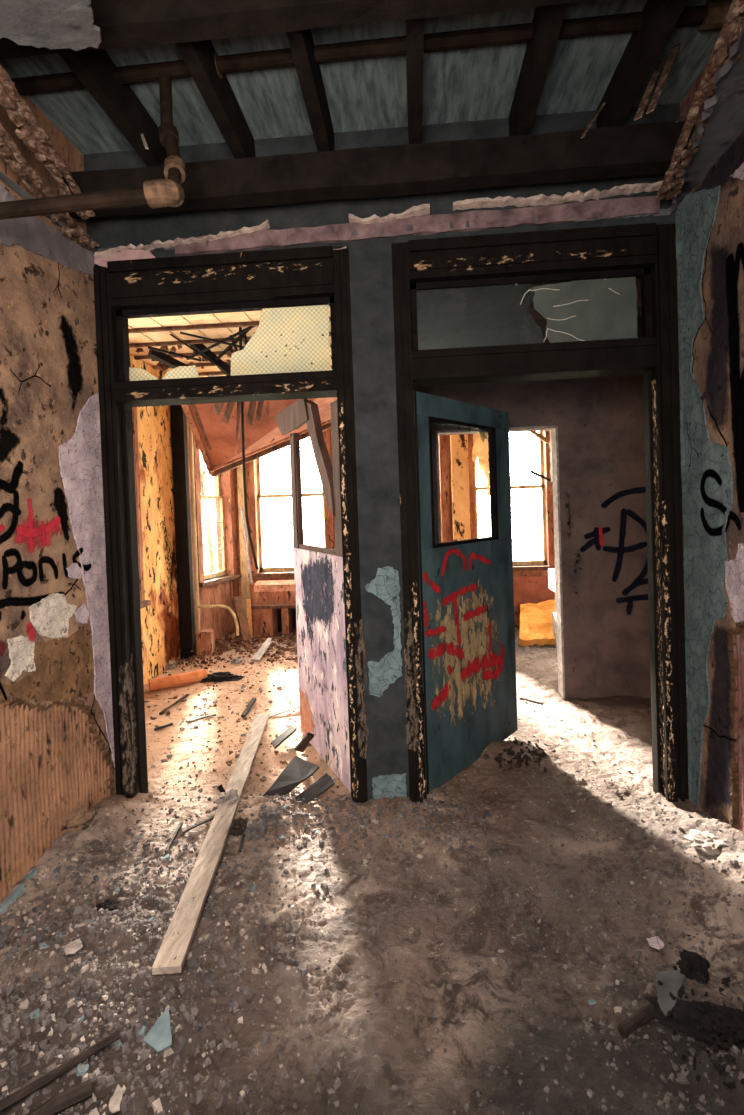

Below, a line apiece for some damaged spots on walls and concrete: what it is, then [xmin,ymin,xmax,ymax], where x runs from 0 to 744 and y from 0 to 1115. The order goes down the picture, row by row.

flaking render [0,394,139,902]
peeling [651,162,744,834]